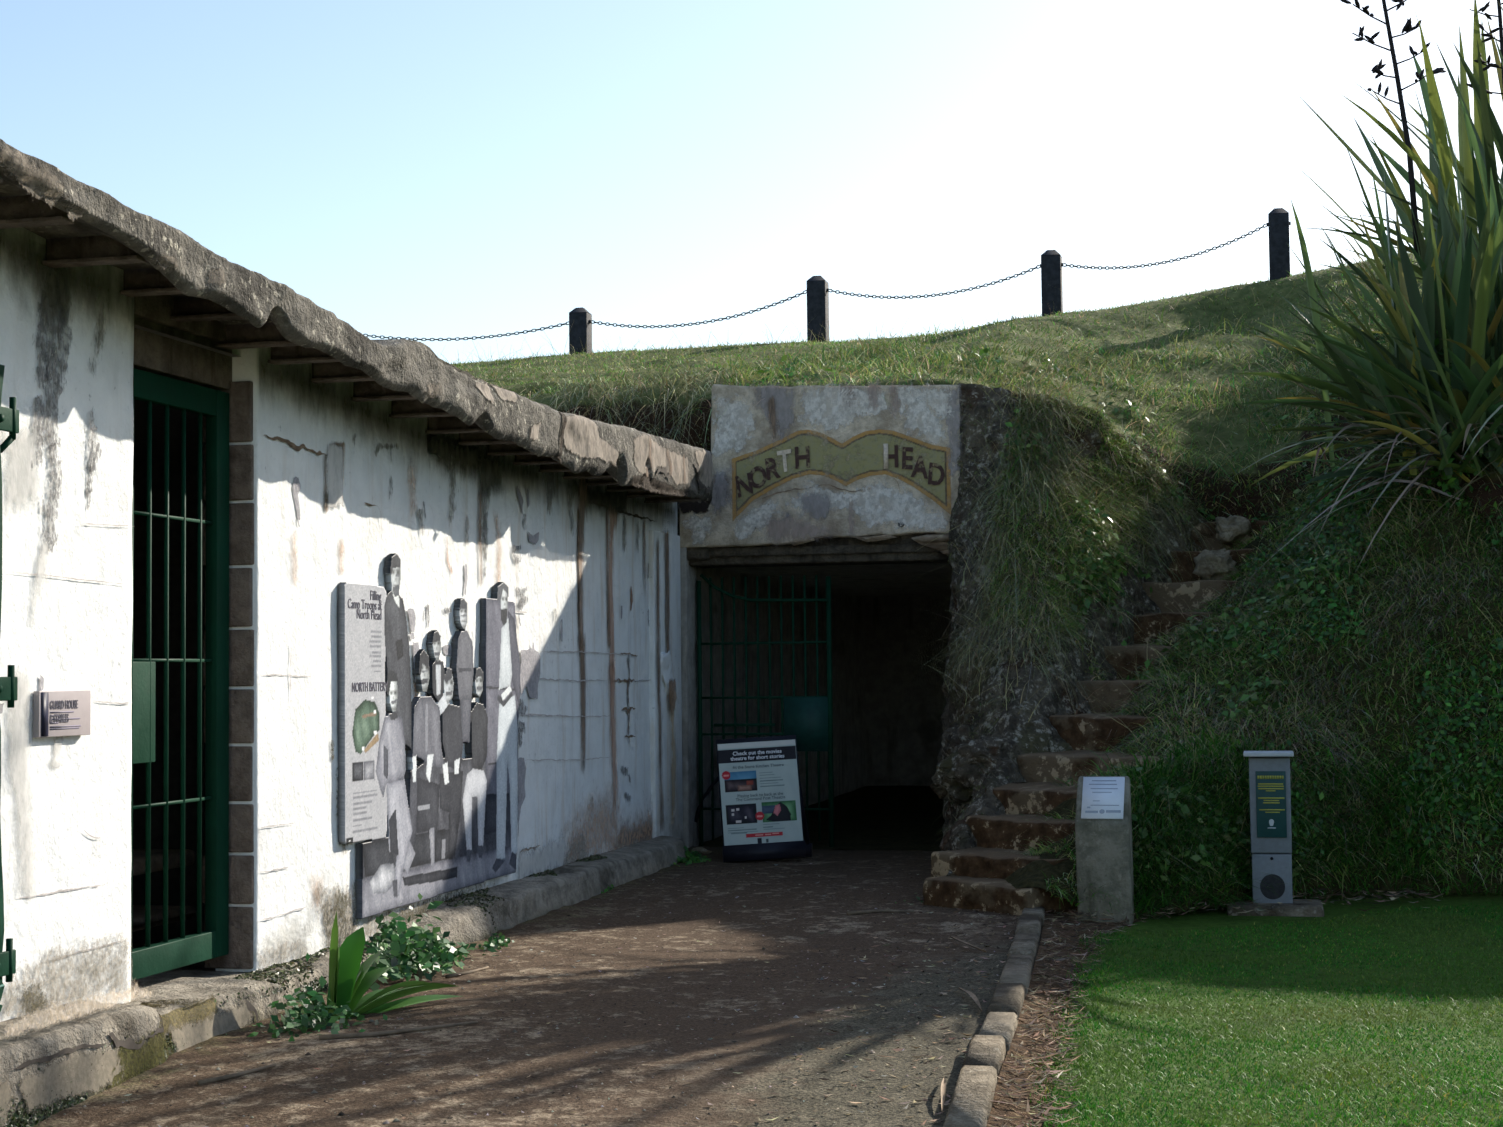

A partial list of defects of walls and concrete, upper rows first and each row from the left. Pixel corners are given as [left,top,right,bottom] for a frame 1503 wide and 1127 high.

damp [0,229,135,319]
crack [266,435,327,456]
rust [606,492,624,805]